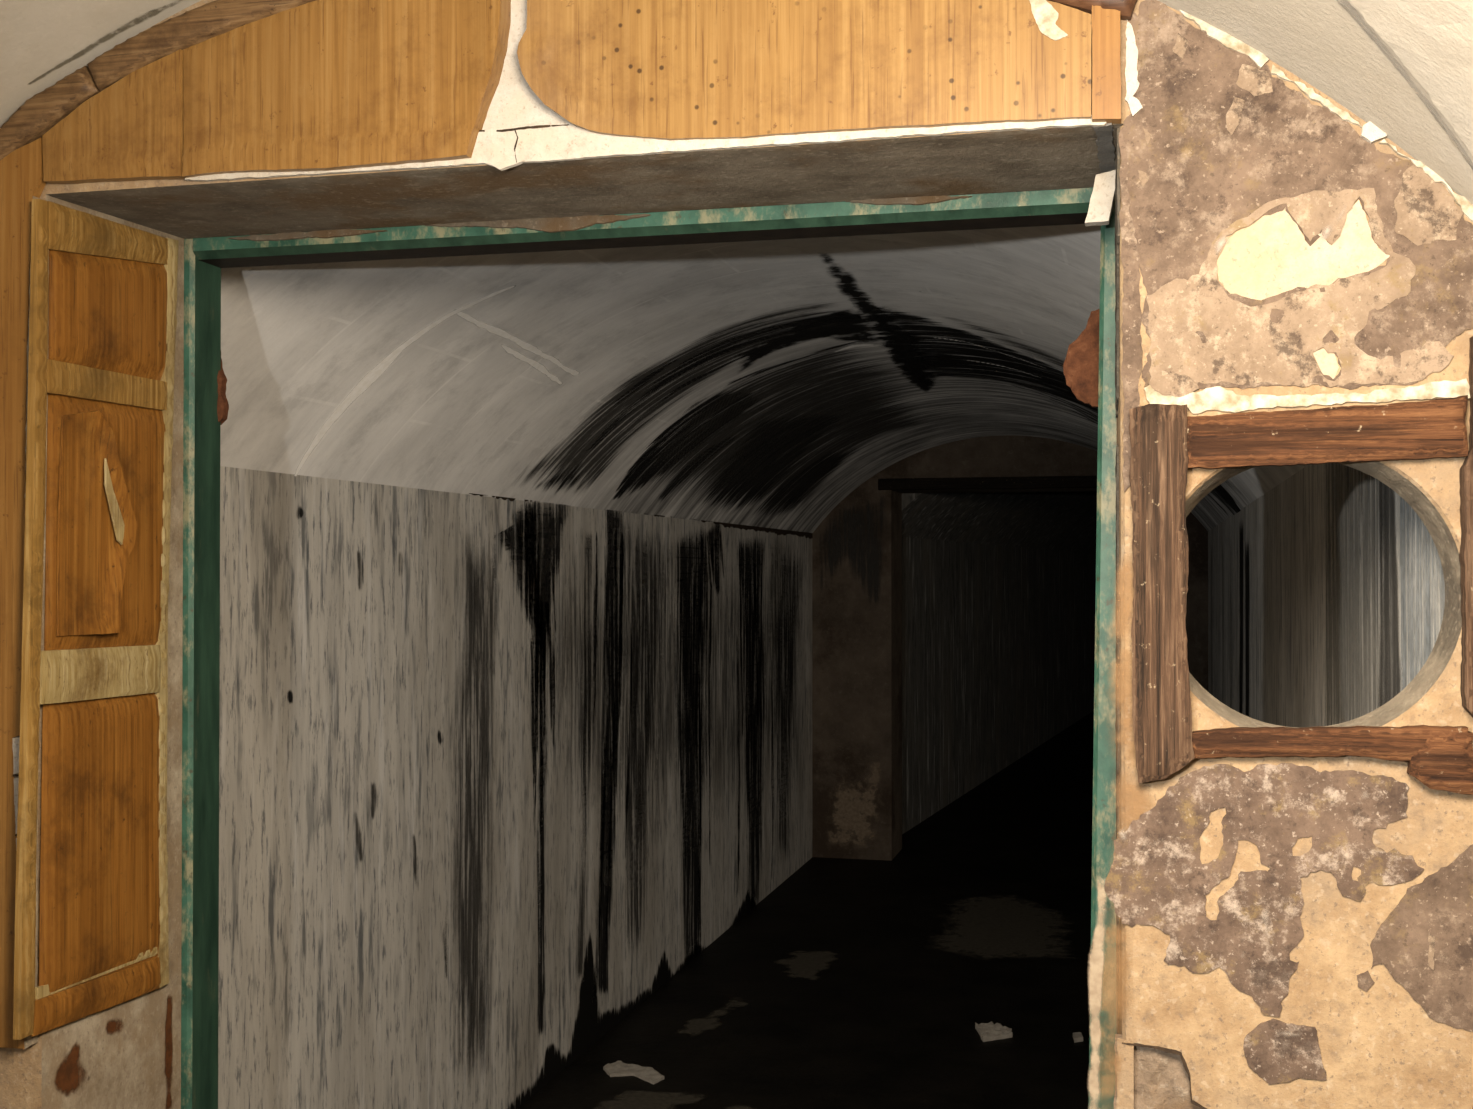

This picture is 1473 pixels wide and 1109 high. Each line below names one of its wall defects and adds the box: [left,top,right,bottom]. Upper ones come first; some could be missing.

peeling [185,0,1473,492]
water stain [356,784,376,860]
water stain [444,254,1098,1109]
water stain [1207,481,1249,717]
peeling [1104,444,1424,1085]
peeling [1357,844,1473,1032]
flaking render [1114,1034,1201,1109]